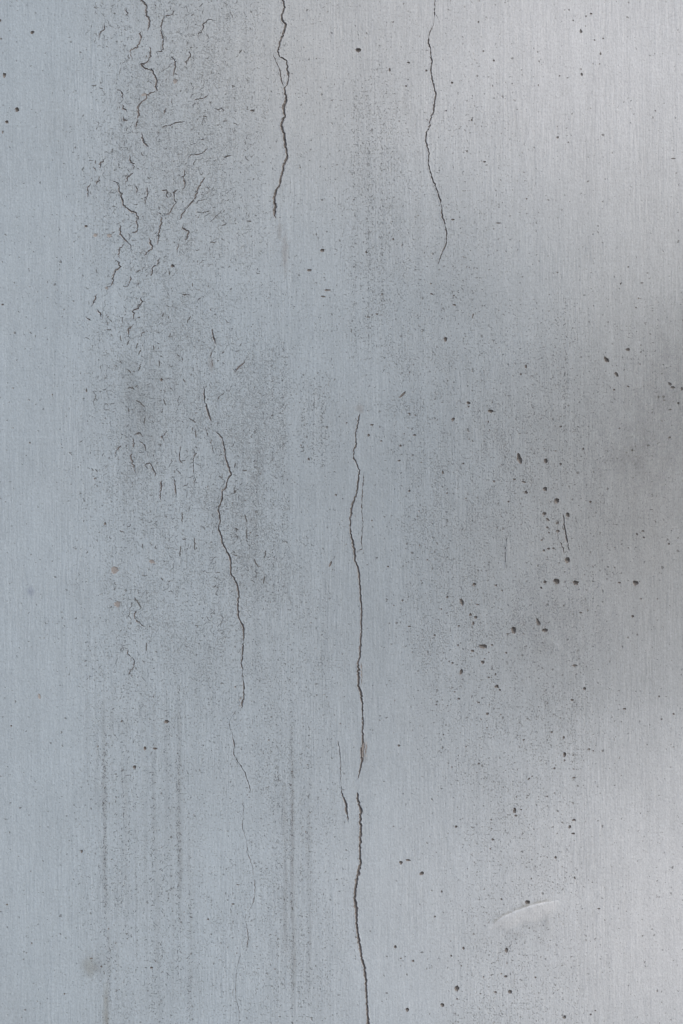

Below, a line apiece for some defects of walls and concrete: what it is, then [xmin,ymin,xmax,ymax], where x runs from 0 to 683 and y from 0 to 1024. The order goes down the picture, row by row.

crack [47,0,503,1024]